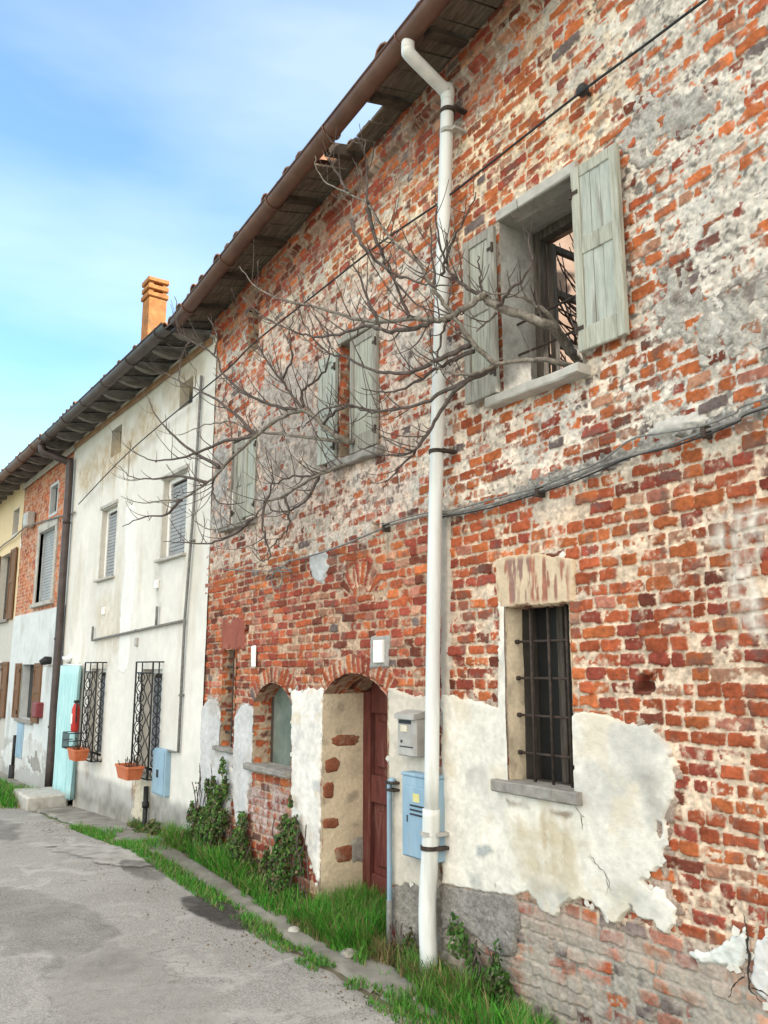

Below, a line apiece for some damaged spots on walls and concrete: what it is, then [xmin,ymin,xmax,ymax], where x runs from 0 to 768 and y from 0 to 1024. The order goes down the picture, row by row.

flaking render [385,687,425,887]
flaking render [436,602,686,941]
crack [728,914,768,1005]